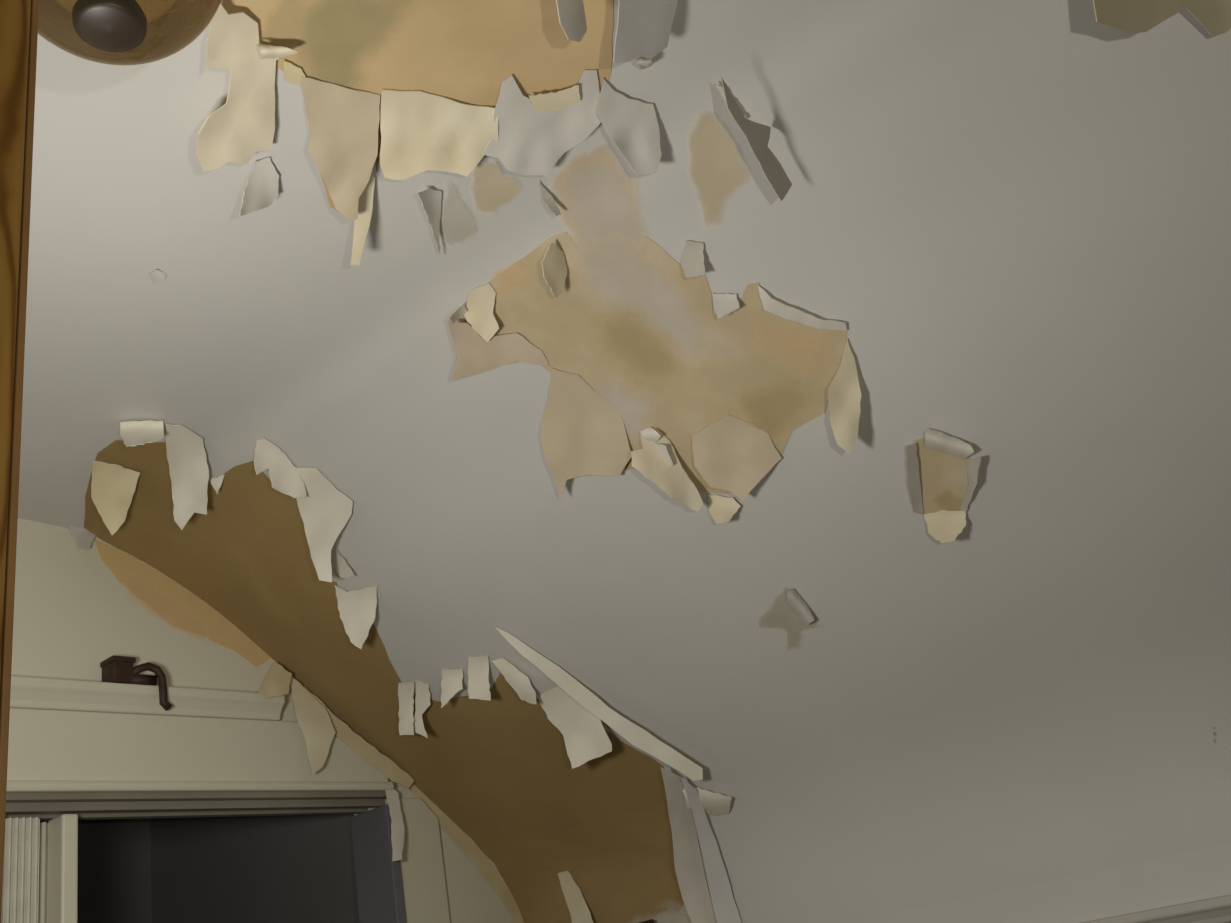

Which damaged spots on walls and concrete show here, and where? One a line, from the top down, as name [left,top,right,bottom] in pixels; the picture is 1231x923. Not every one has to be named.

peeling [1093,0,1231,37]
peeling [196,0,861,524]
peeling [906,428,981,544]
peeling [69,420,742,923]
peeling [759,589,817,649]